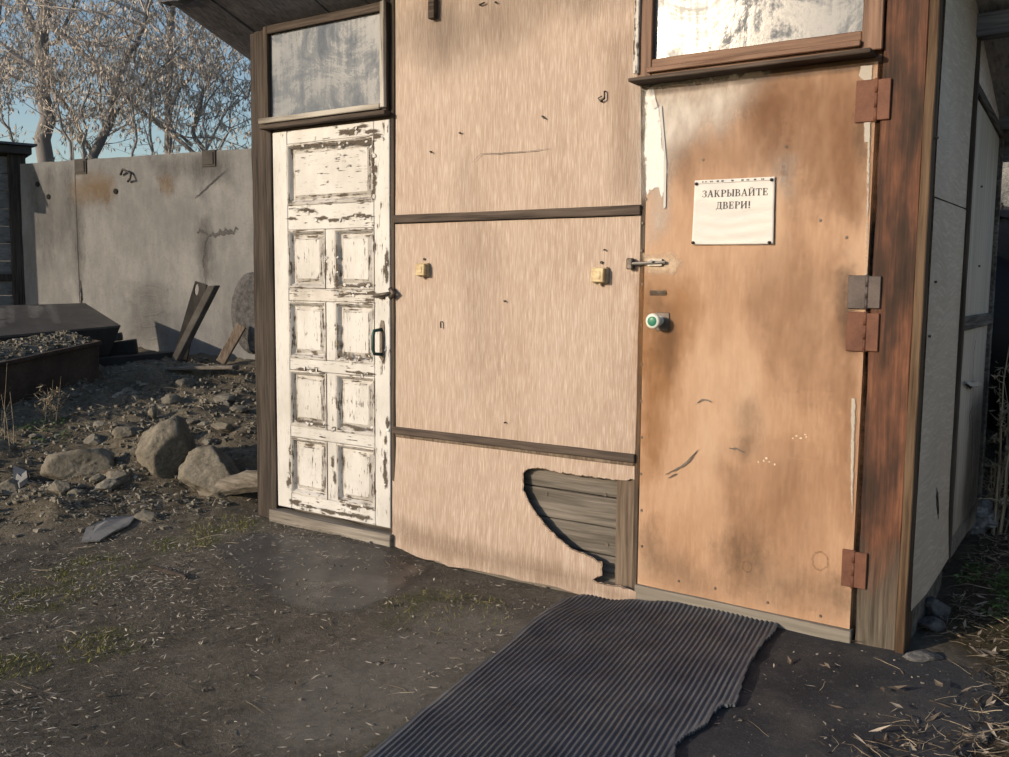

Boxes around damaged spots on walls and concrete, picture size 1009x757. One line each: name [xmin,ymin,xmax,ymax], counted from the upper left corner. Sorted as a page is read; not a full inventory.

peeling [288,124,384,199]
peeling [644,73,763,209]
peeling [288,208,374,222]
peeling [322,244,389,297]
peeling [334,325,386,378]
peeling [381,416,390,487]